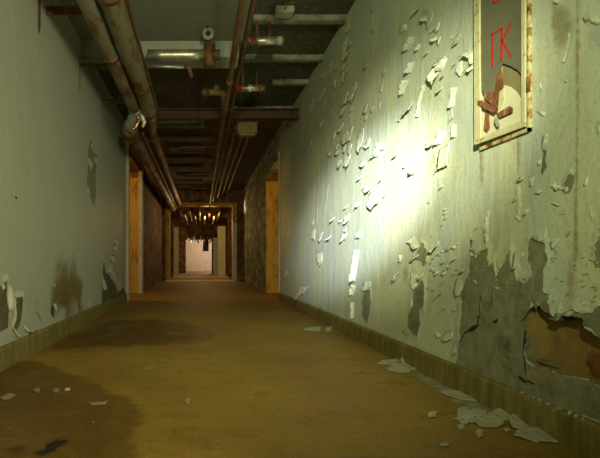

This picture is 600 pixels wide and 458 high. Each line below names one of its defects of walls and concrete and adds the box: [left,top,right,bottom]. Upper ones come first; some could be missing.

peeling [399,22,429,57]
peeling [327,82,386,168]
peeling [87,139,98,206]
peeling [328,175,387,242]
peeling [0,274,32,337]
water stain [52,269,82,308]
peeling [102,238,125,302]
water stain [57,319,213,349]
peeling [311,219,331,266]
crack [458,289,493,343]
peeling [398,211,600,421]